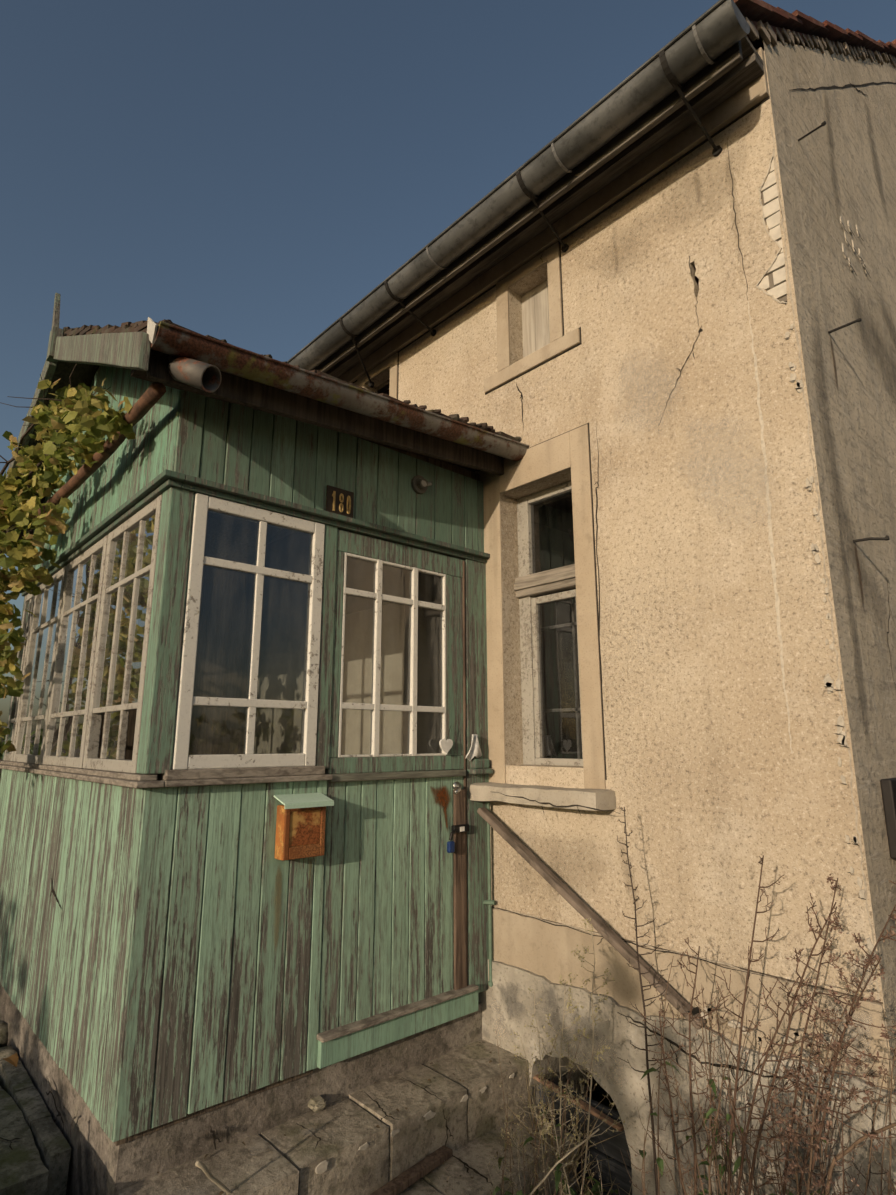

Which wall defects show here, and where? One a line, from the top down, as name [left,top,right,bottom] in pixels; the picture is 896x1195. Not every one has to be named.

crack [658,326,702,426]
spalling [756,115,880,1004]
spalling [315,1160,329,1174]